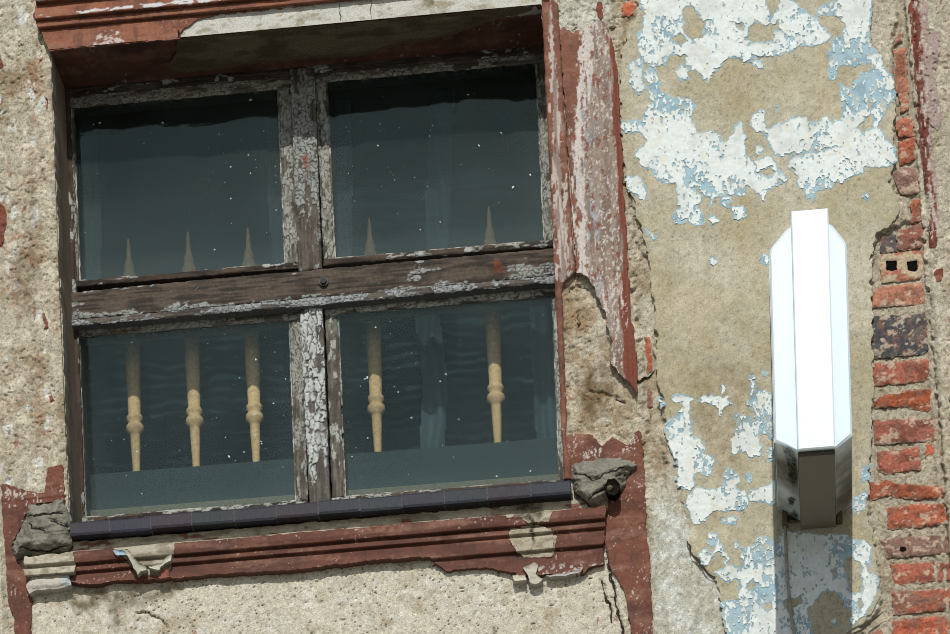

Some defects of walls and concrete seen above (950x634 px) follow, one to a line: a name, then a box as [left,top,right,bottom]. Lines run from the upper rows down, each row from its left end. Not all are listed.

spalling [566,277,634,439]
peeling [620,0,950,634]
crack [601,552,624,634]